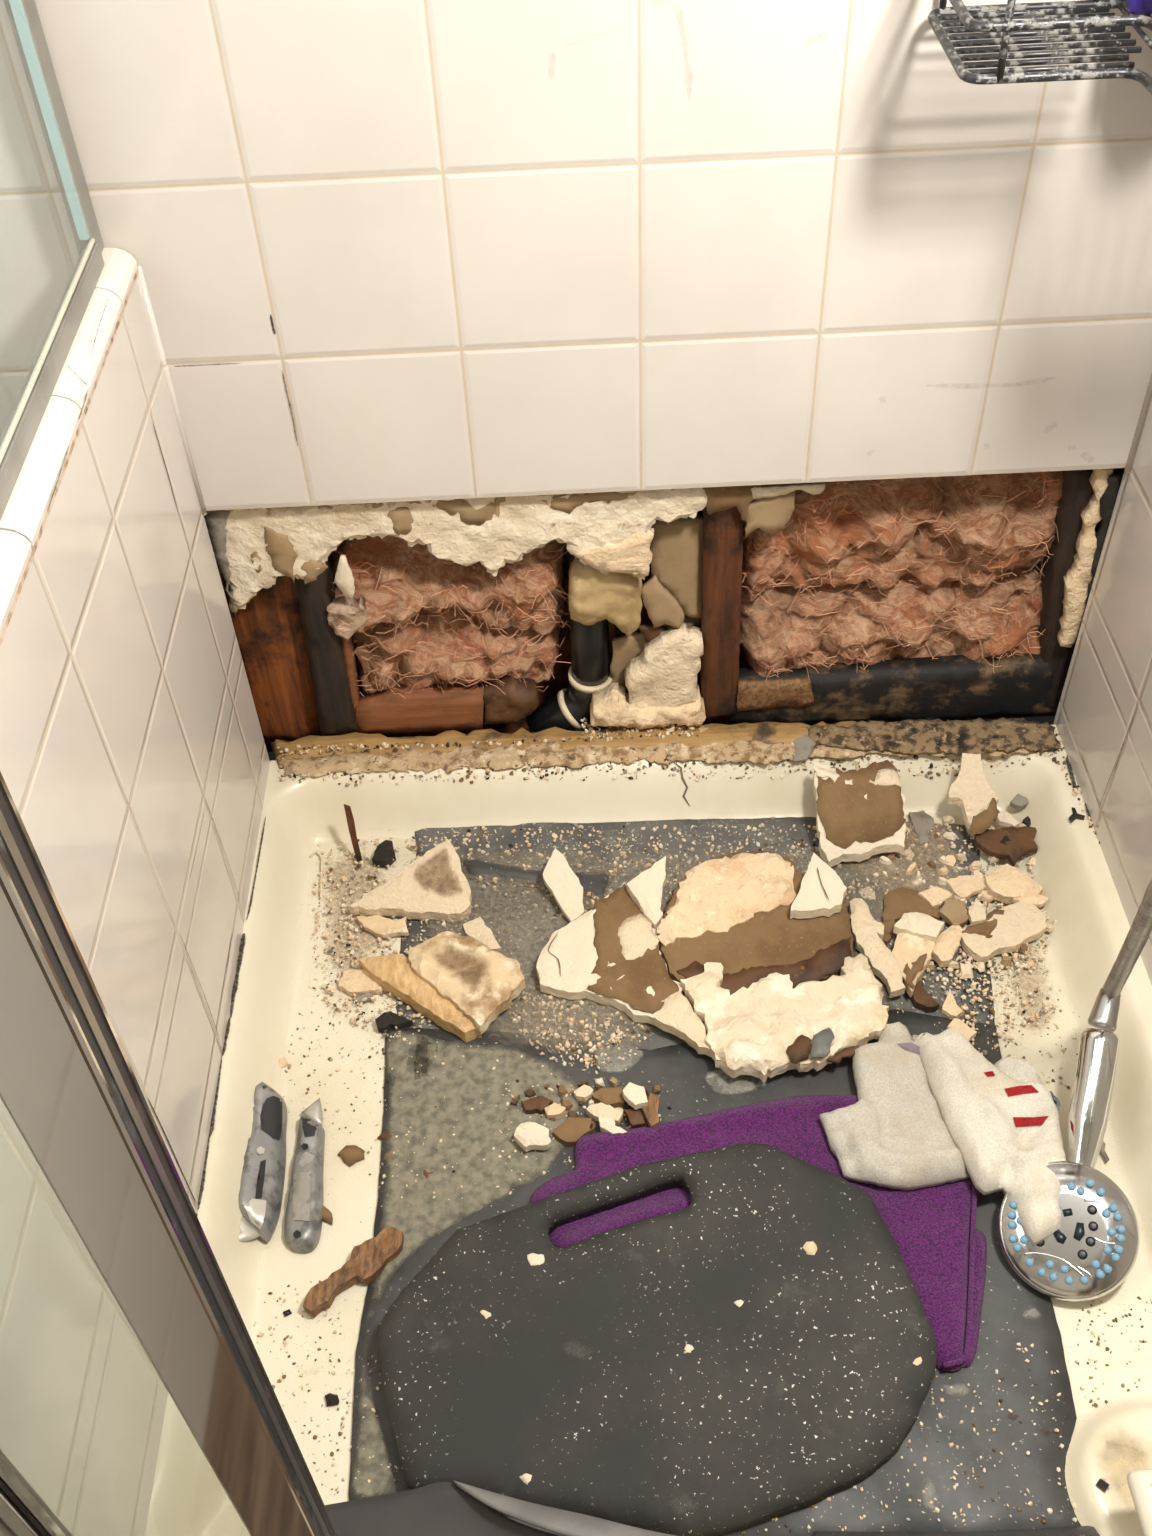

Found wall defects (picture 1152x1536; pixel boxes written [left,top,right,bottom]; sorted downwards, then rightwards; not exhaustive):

crack [282,373,298,446]
peeling [204,488,707,618]
spalling [1057,468,1114,648]